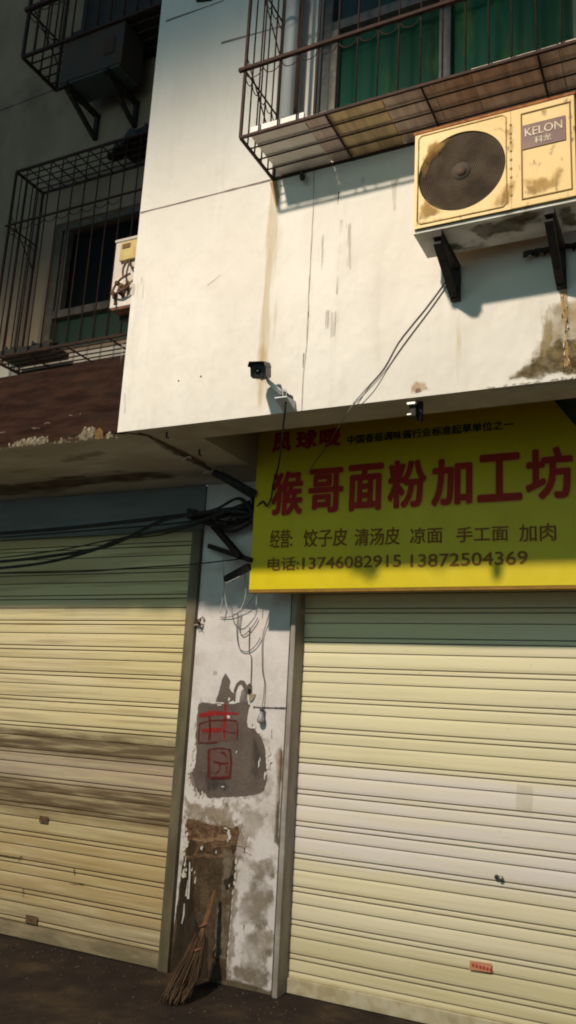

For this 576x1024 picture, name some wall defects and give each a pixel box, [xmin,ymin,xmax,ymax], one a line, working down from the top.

rust [270,180,279,206]
peeling [487,293,576,392]
rust [560,290,569,366]
peeling [2,426,119,449]
water stain [185,798,236,826]
spalling [181,817,247,968]
water stain [170,849,274,995]